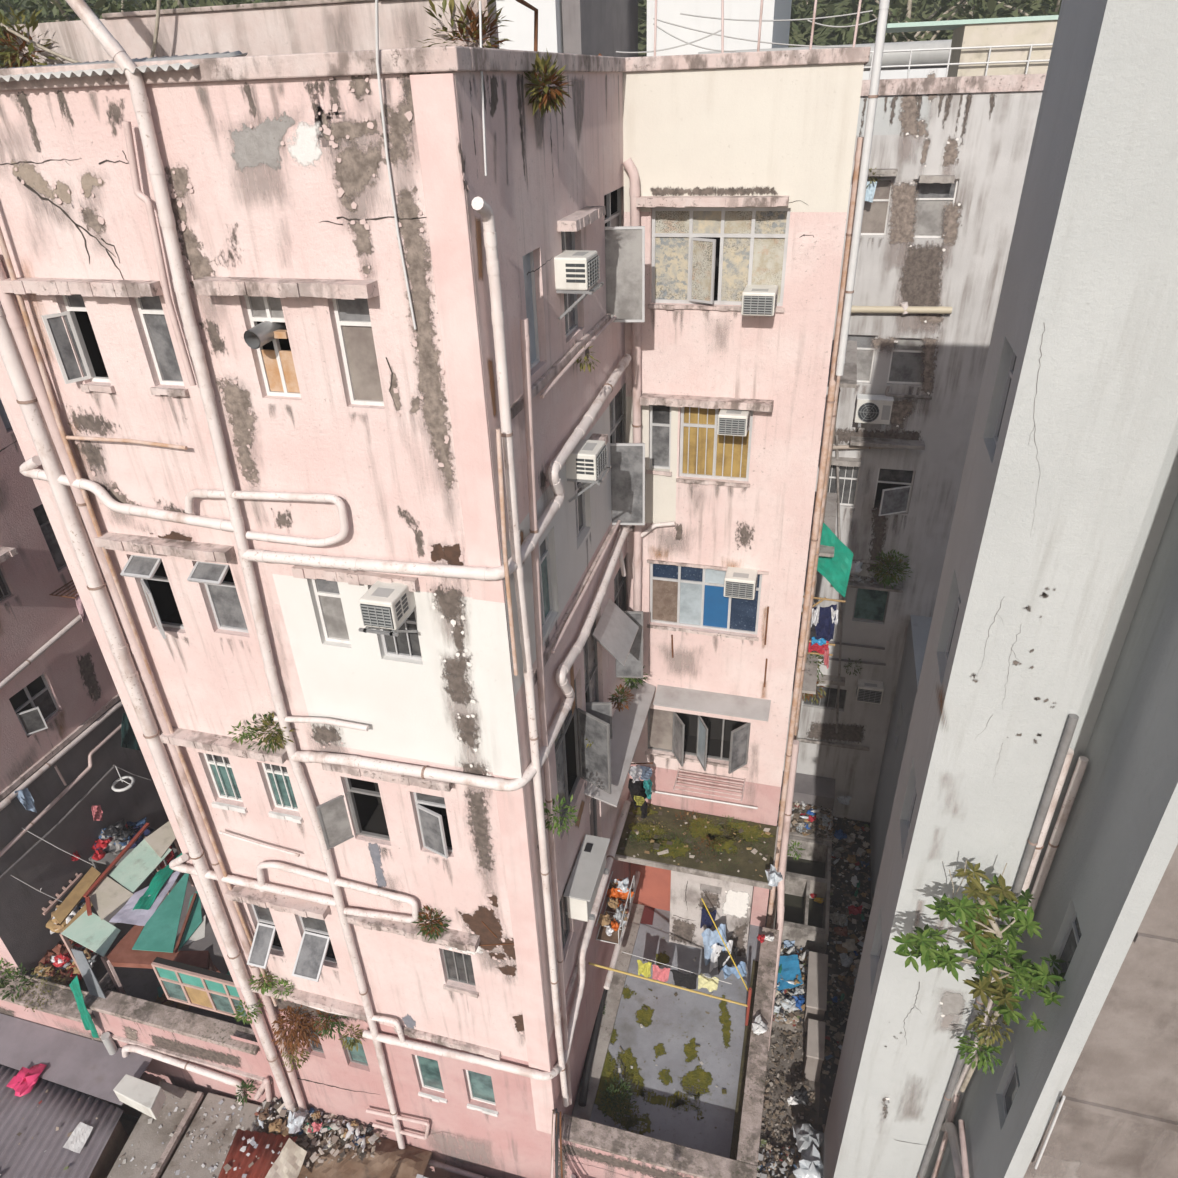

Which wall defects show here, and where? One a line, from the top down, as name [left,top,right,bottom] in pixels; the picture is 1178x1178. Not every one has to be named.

damp [242,83,260,124]
damp [306,81,325,115]
damp [387,77,411,98]
damp [884,96,899,125]
damp [938,94,972,145]
peeling [229,111,295,196]
crack [0,150,128,280]
damp [66,398,120,436]
damp [735,522,755,549]
damp [76,652,101,704]